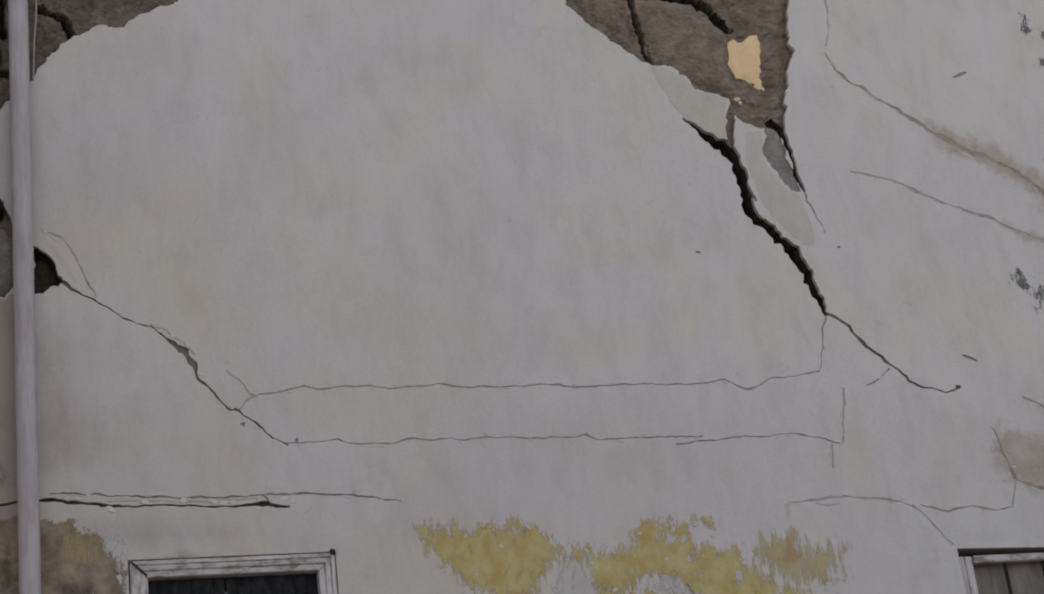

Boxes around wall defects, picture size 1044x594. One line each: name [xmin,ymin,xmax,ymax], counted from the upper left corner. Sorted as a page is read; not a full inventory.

spalling [0,0,10,109]
spalling [28,0,179,82]
spalling [566,0,800,192]
crack [824,0,1044,195]
spalling [0,201,13,298]
crack [61,97,960,468]
crack [850,171,1044,242]
crack [0,492,398,513]
crack [790,426,1044,545]
peeling [0,516,19,594]
peeling [40,519,128,594]
peeling [414,515,847,594]